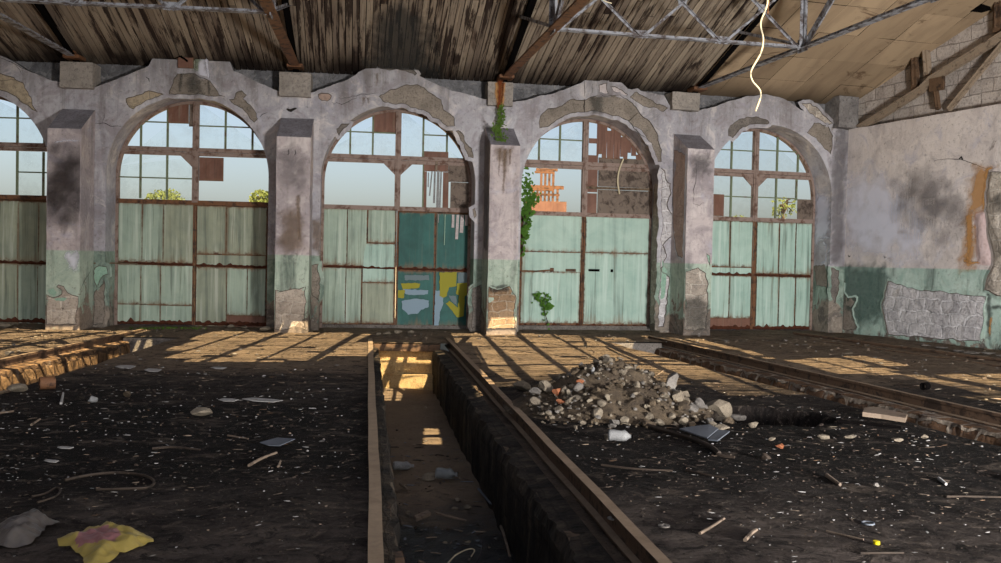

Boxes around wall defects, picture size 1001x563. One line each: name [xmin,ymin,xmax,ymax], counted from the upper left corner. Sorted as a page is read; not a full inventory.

flaking render [0,69,40,116]
flaking render [122,55,262,127]
flaking render [375,66,477,162]
leakage [815,131,923,261]
rust [963,167,992,266]
peeling [46,281,79,330]
flaking render [93,261,112,328]
peeling [467,282,517,333]
spalling [535,80,1001,446]
leakage [844,266,885,321]
spalling [0,337,180,391]